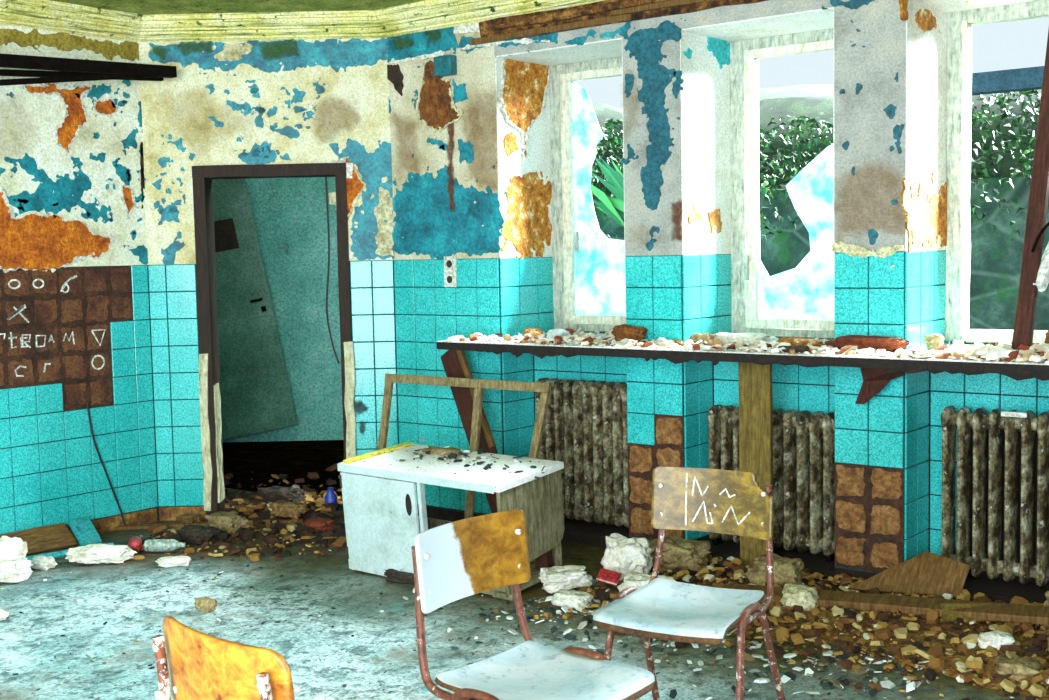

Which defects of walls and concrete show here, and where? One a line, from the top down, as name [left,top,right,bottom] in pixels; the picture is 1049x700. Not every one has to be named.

peeling [0,80,195,411]
peeling [0,0,768,260]